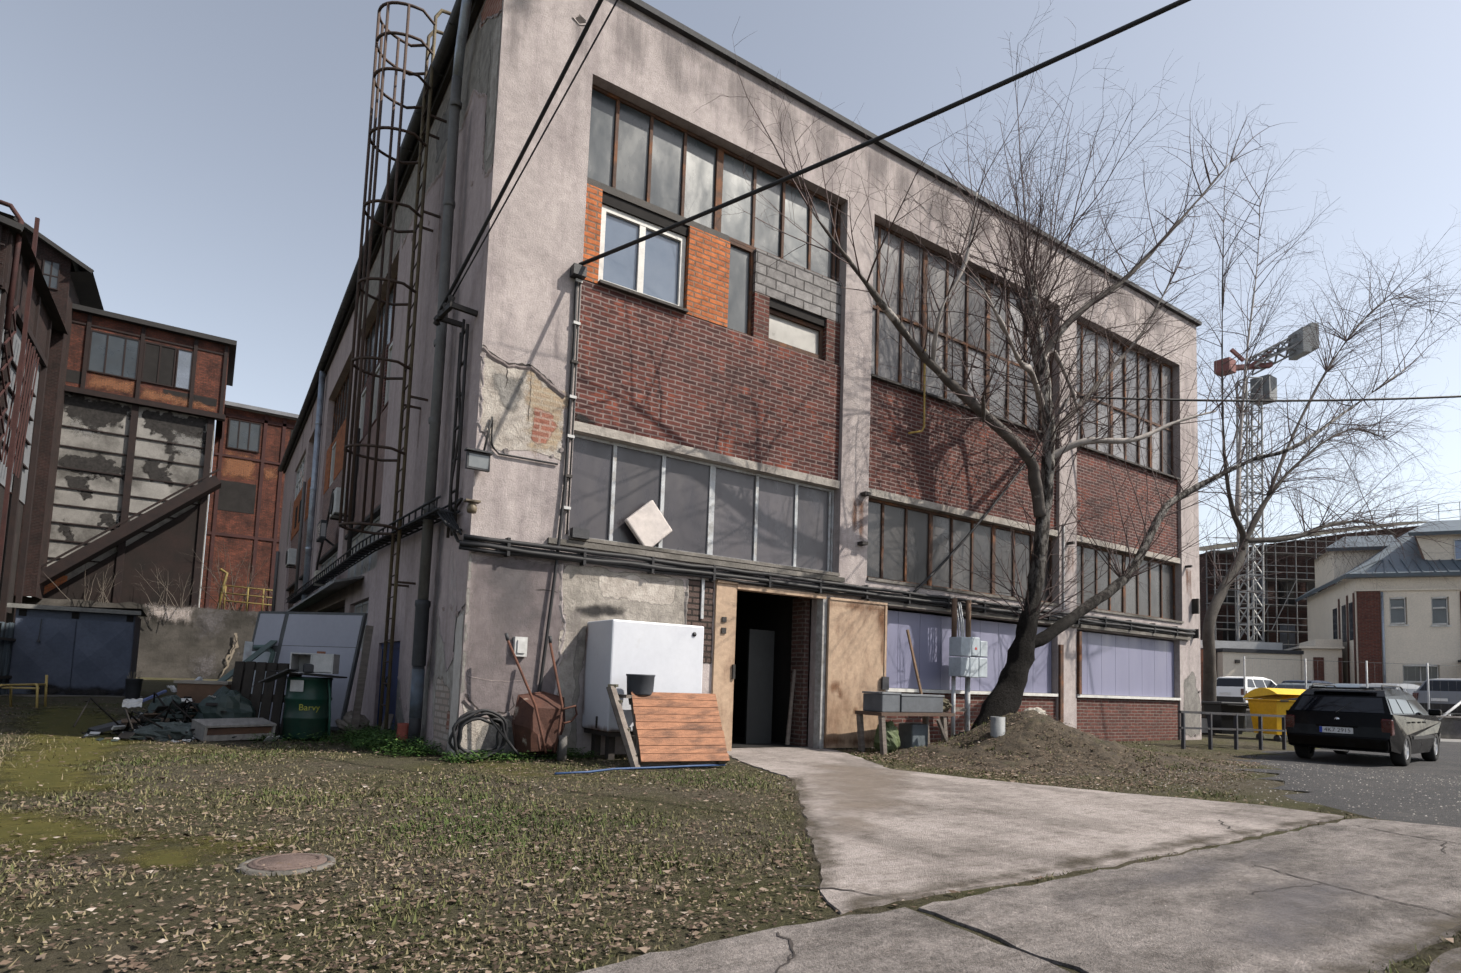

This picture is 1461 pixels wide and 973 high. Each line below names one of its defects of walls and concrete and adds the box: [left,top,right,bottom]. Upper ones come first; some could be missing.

flaking render [357,0,503,333]
flaking render [476,346,569,460]
flaking render [394,554,534,757]
flaking render [553,564,714,756]